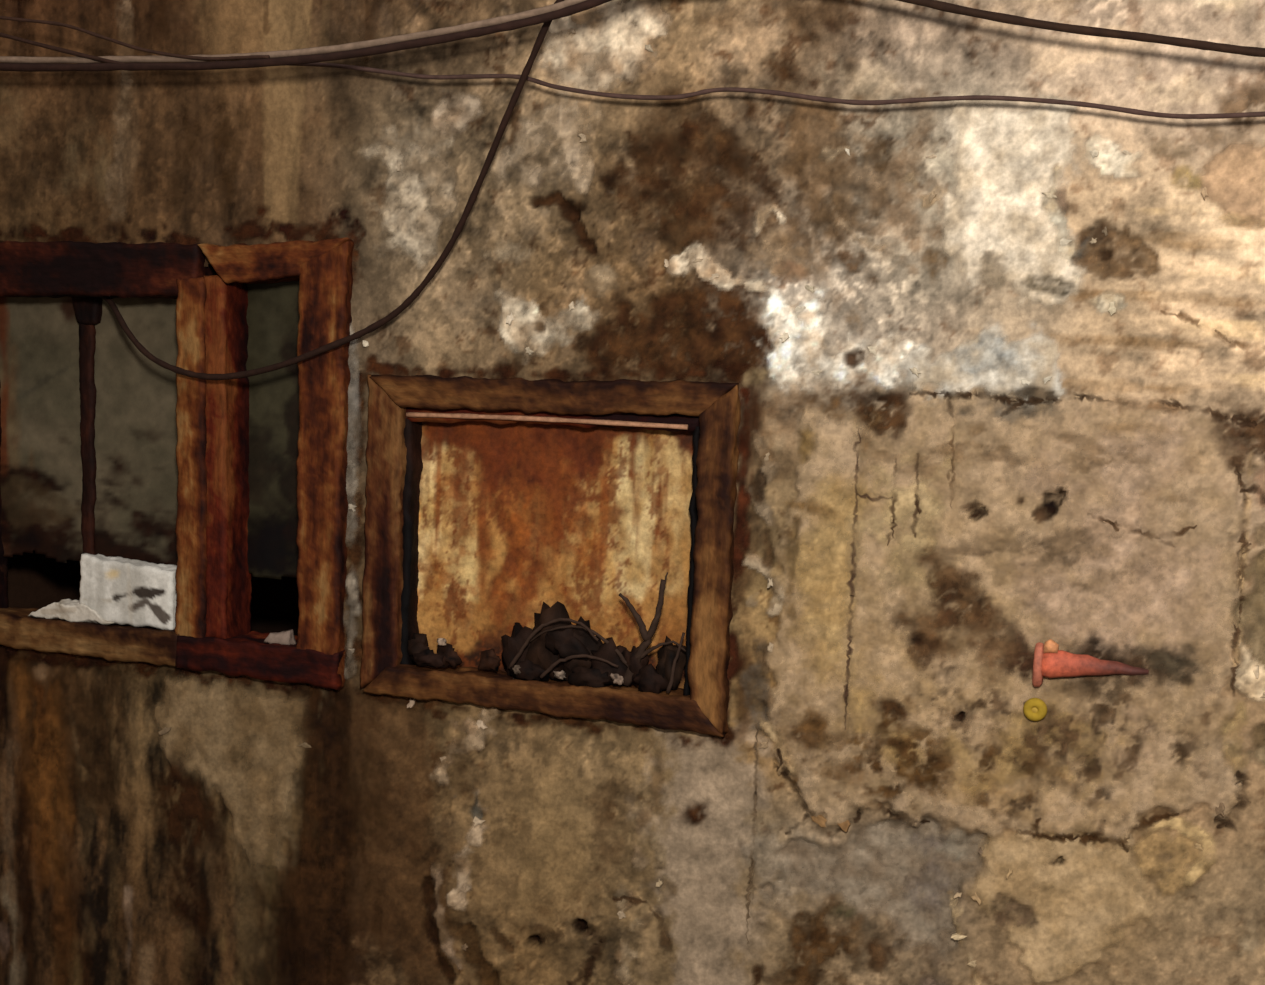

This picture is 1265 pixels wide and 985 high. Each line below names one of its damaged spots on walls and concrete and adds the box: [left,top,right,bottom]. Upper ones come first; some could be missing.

corrosion [225,208,366,276]
damp [601,113,781,247]
corrosion [532,277,776,580]
corrosion [417,421,694,672]
corrosion [5,646,157,677]
damp [17,806,32,929]
damp [158,762,224,934]
damp [272,684,364,985]
crack [753,724,809,834]
crack [838,809,930,830]
peeling [760,815,1214,985]
crack [1021,813,1179,852]